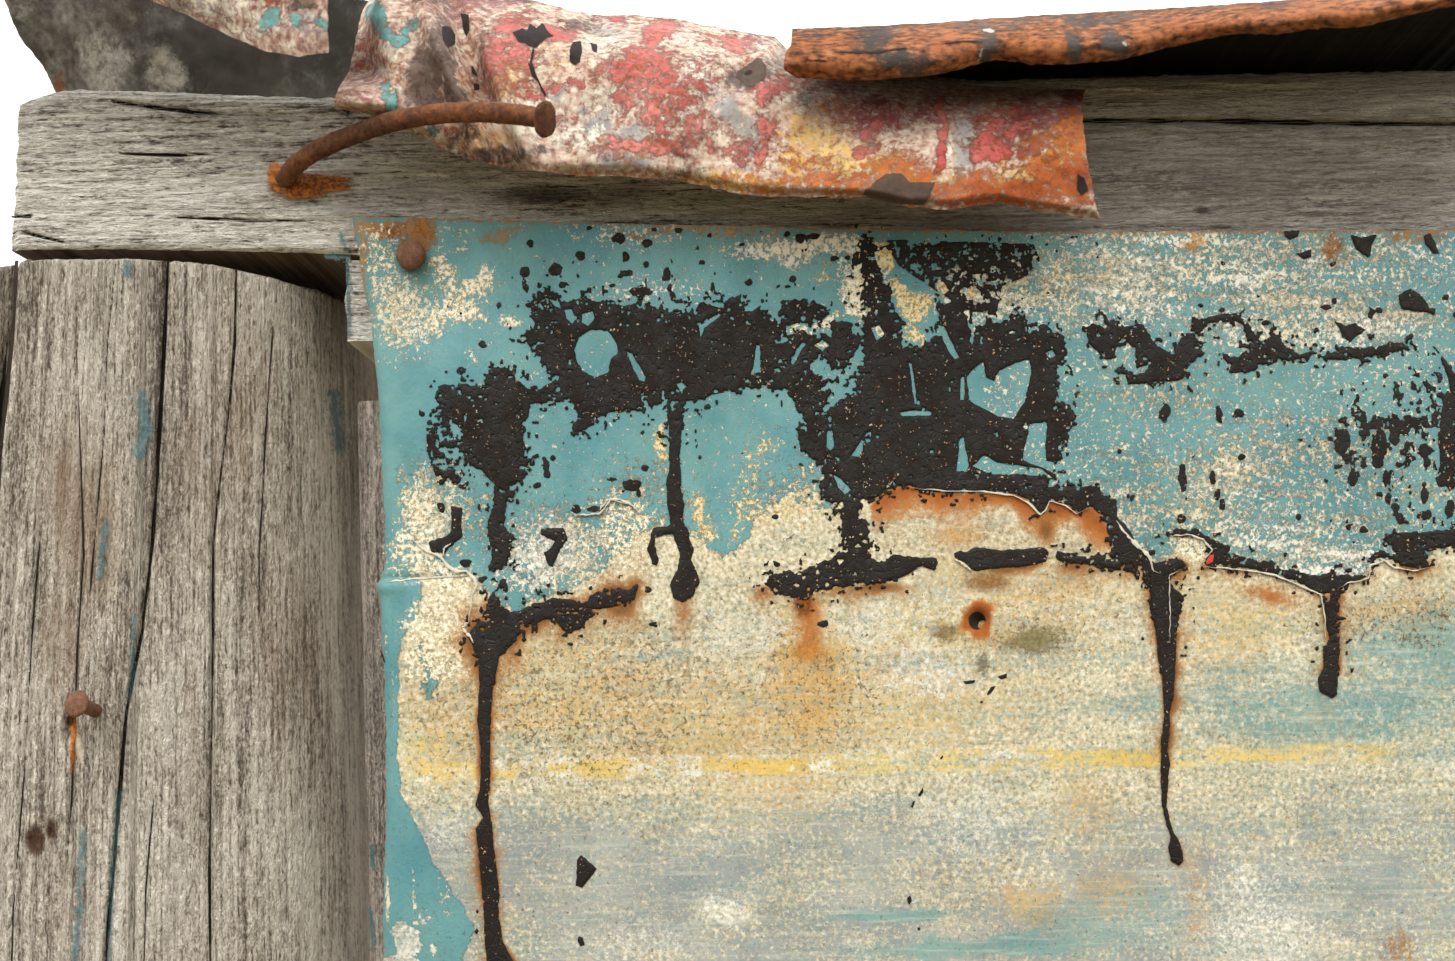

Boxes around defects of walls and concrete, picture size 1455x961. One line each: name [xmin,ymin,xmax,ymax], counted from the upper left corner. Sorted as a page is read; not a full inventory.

rust [267,162,351,199]
peeling [352,222,524,364]
peeling [786,241,978,347]
crack [105,261,169,961]
crack [208,269,274,961]
peeling [380,479,483,691]
peeling [579,492,666,583]
rust [871,485,1110,577]
rust [960,563,1041,639]
peeling [1117,521,1326,638]
rust [66,716,84,764]
rust [452,577,647,961]